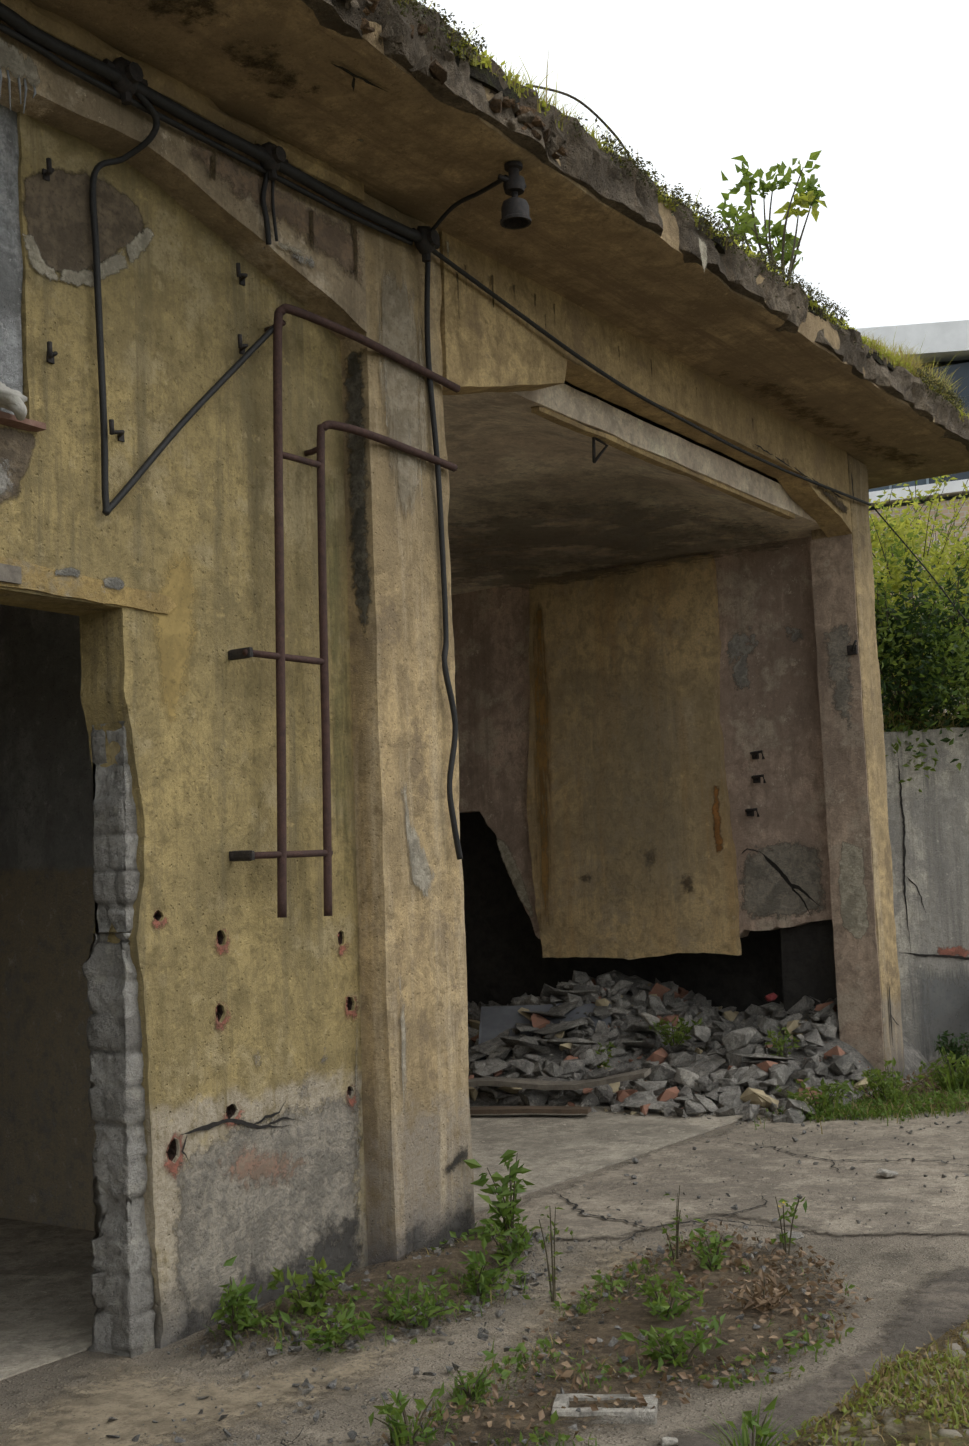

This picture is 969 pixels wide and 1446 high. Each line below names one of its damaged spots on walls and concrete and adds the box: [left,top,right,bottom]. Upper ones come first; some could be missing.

water stain [0,38,40,114]
peeling [22,168,154,287]
peeling [0,427,36,503]
crack [742,848,820,913]
crack [181,1101,296,1162]
crack [738,1143,969,1173]
crack [552,1190,866,1243]